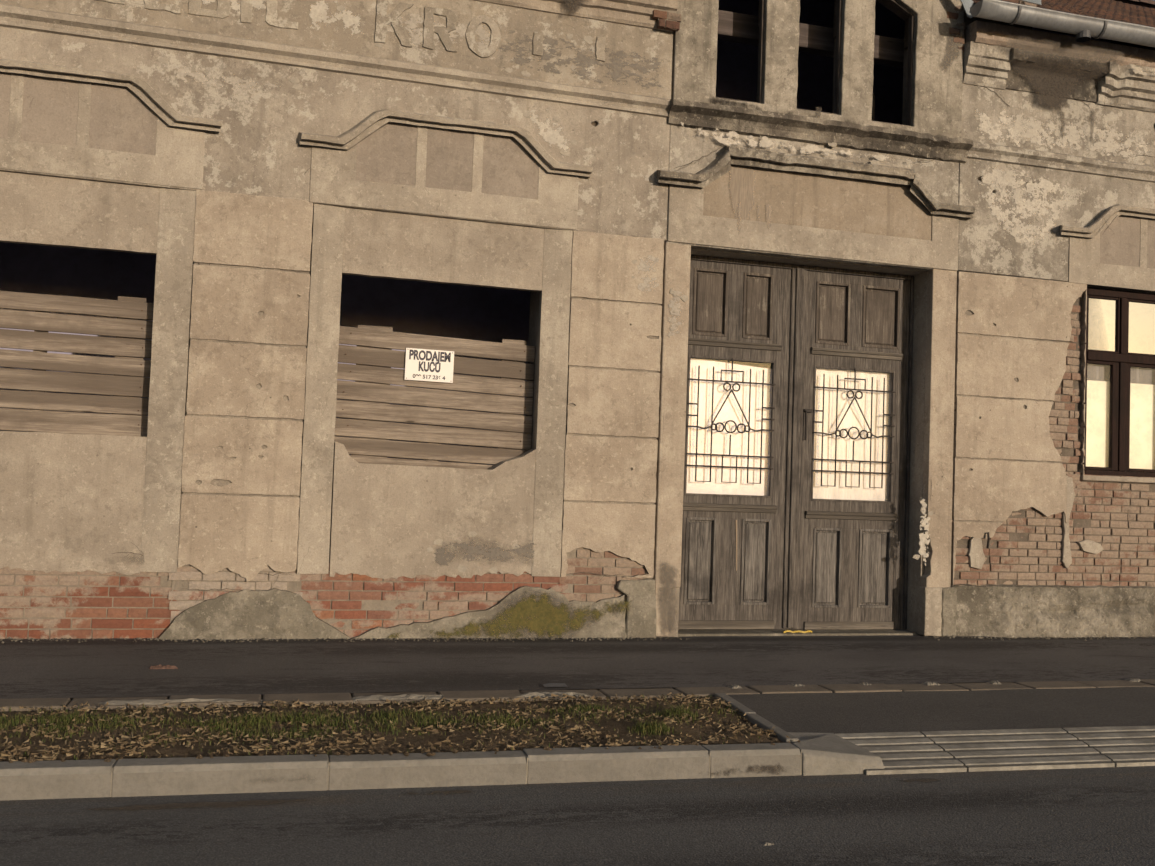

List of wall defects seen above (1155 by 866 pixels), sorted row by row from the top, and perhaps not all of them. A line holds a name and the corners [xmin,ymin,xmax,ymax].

peeling [230,0,266,14]
peeling [309,0,363,35]
leakage [1008,39,1122,109]
peeling [681,122,889,165]
peeling [974,109,1150,165]
peeling [974,163,1073,245]
spalling [951,295,1155,587]
spalling [0,531,655,639]